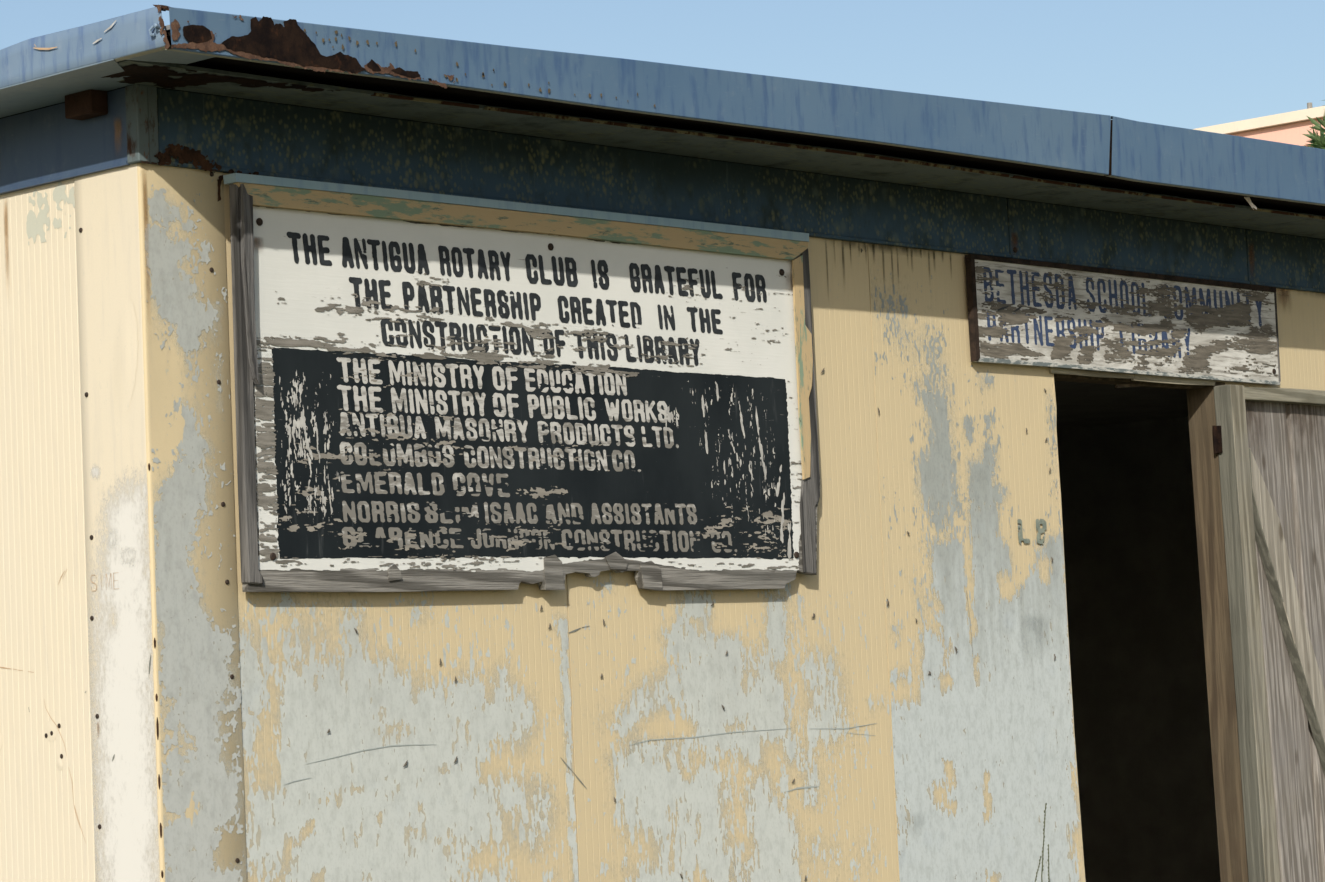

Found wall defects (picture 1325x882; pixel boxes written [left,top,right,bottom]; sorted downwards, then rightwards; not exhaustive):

corrosion [101,64,340,92]
corrosion [157,5,466,88]
corrosion [141,143,259,201]
peeling [91,181,1085,882]